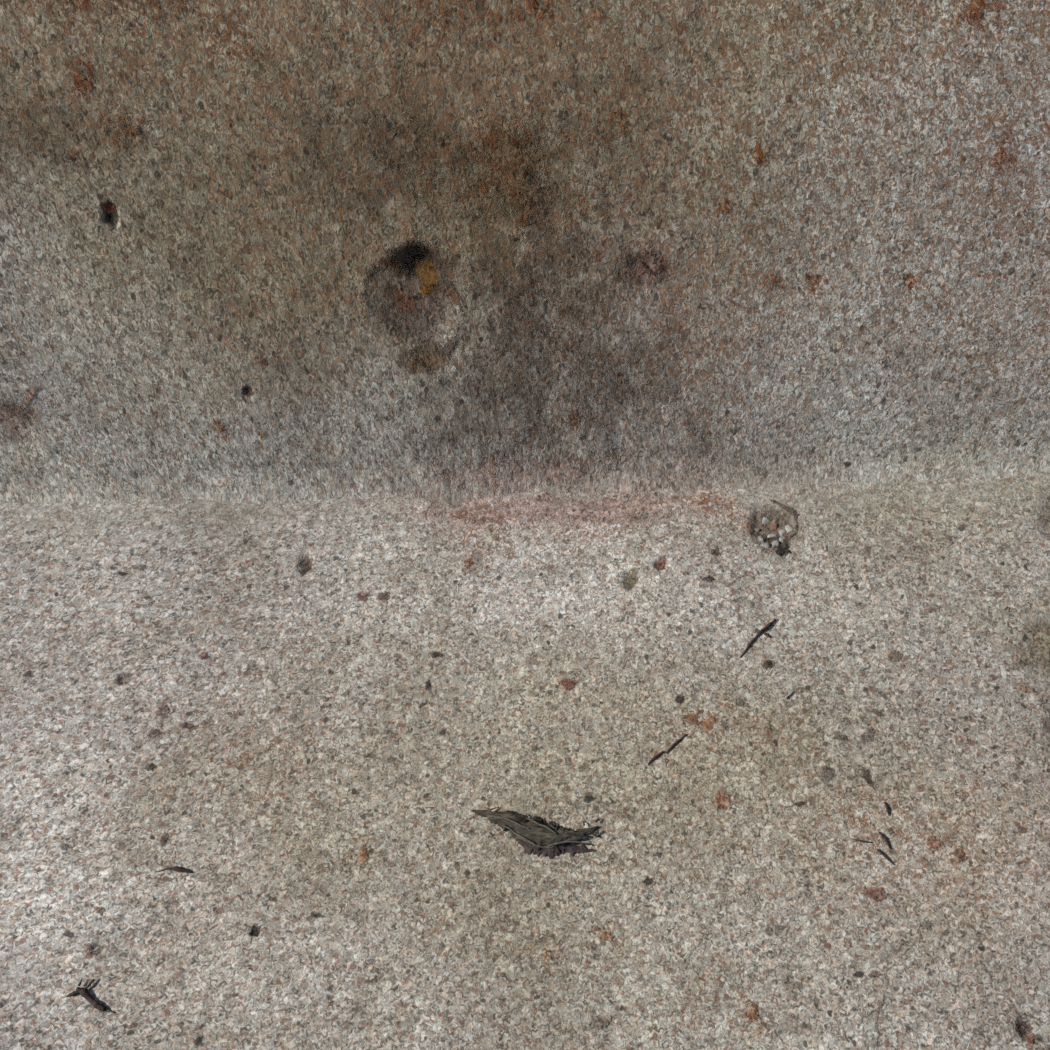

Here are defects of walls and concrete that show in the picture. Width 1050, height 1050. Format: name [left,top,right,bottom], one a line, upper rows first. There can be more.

damp [480,123,551,234]
damp [451,248,655,545]